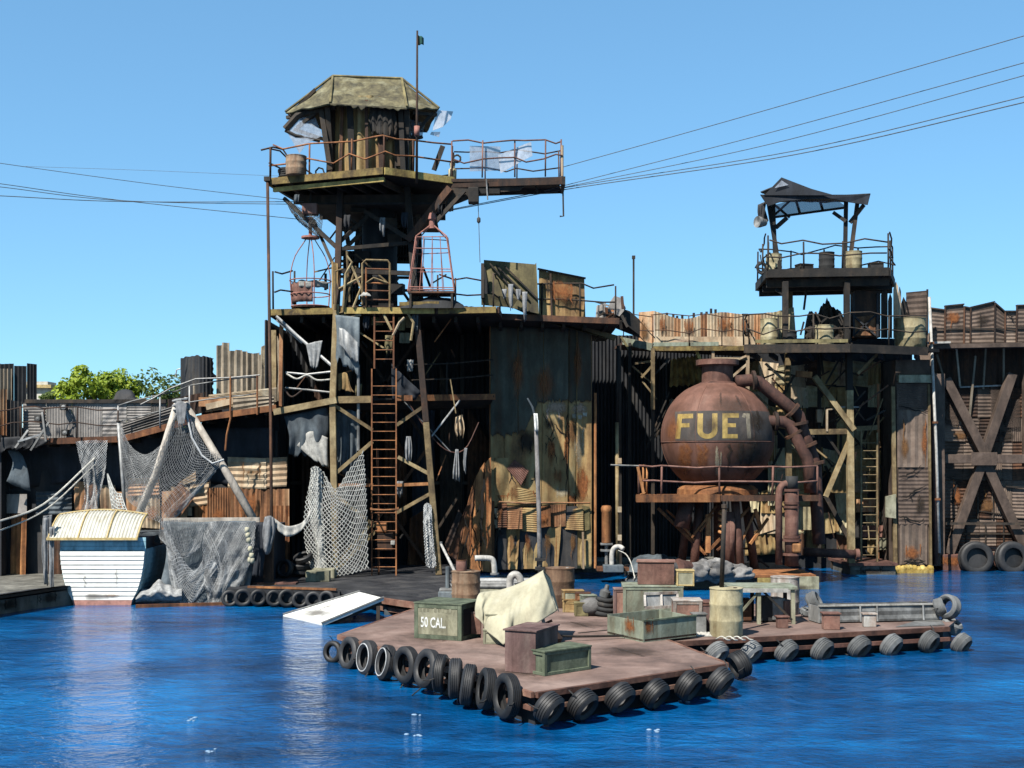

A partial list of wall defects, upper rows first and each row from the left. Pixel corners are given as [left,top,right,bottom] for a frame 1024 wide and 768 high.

rust [553,281,573,302]
rust [548,428,568,480]
rust [568,470,588,506]